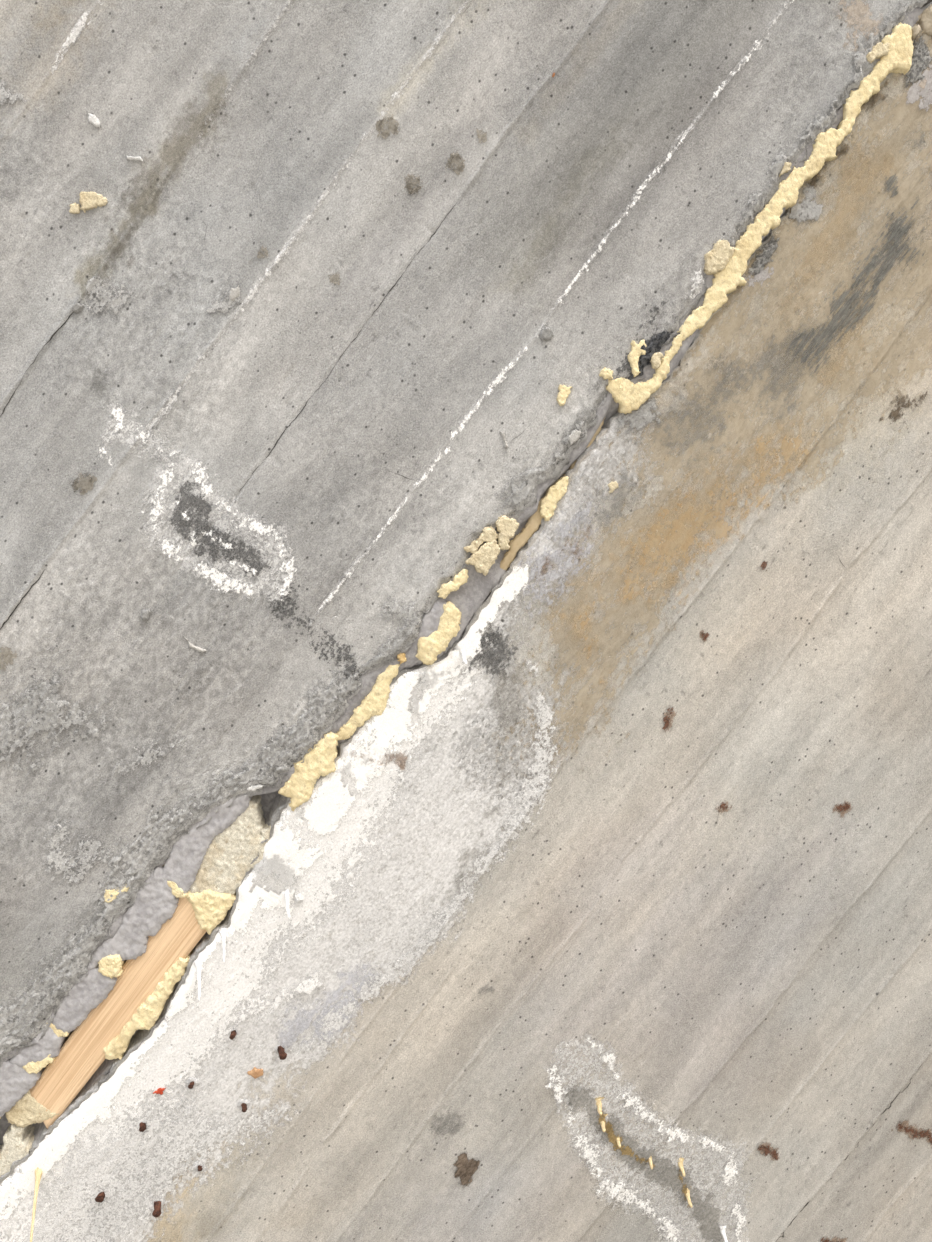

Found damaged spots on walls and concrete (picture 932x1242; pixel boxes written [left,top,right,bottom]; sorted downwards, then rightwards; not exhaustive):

water stain [860,89,887,110]
crack [740,105,844,256]
water stain [99,0,762,683]
crack [322,273,715,750]
crack [249,760,300,826]
water stain [43,818,111,886]
spalling [0,602,432,1056]
crack [84,1029,146,1090]
spalling [247,1067,264,1079]
crack [0,1113,45,1146]
water stain [544,1034,753,1242]
rust [892,1120,932,1144]